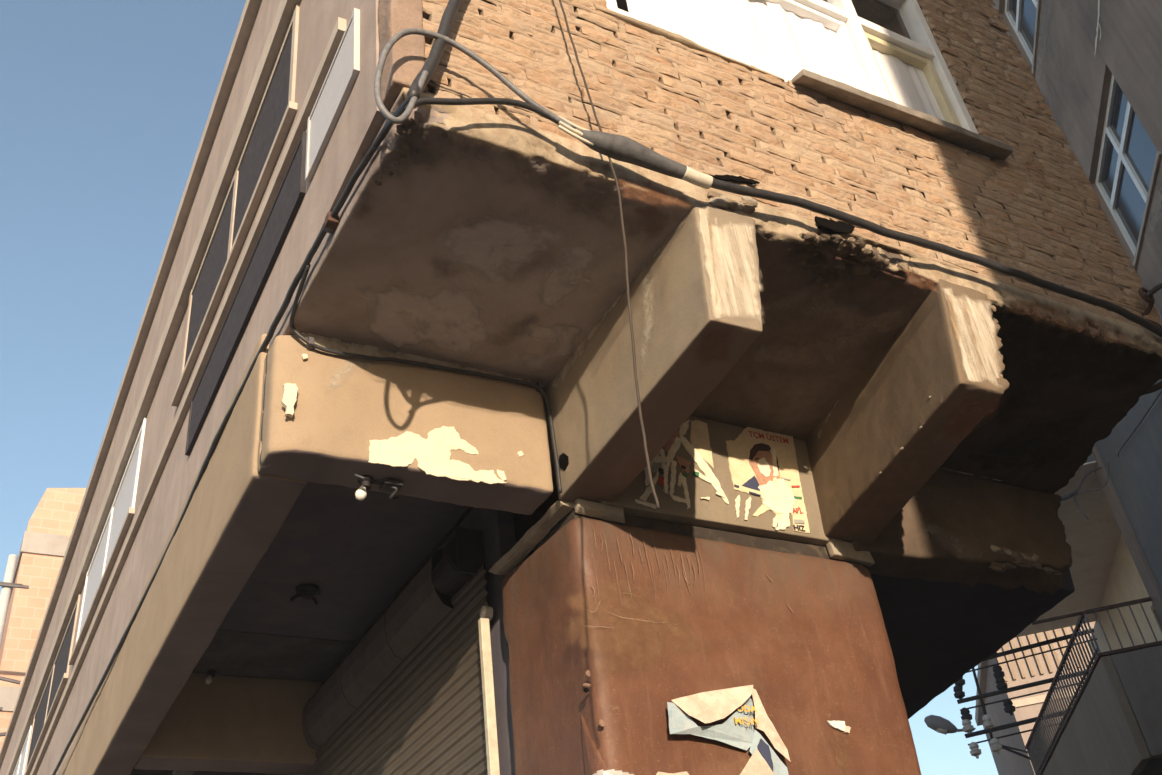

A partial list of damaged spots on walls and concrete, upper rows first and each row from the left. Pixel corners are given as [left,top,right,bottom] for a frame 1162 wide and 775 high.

leakage [441,218,599,306]
spalling [788,216,910,287]
leakage [364,286,488,354]
leakage [642,278,653,357]
peeling [281,383,298,418]
peeling [368,426,507,484]